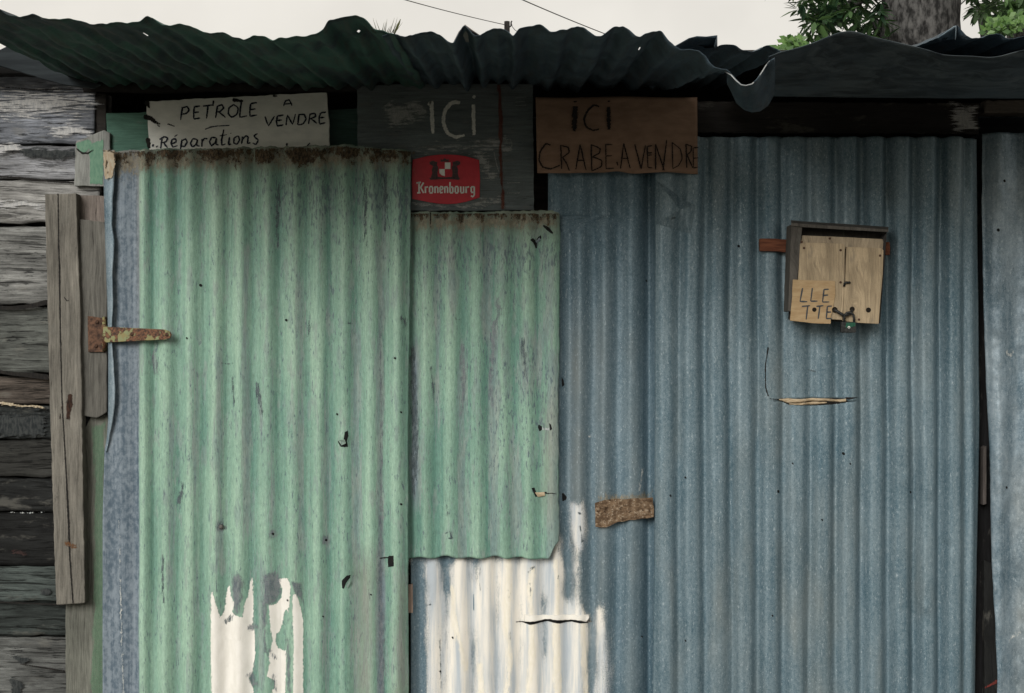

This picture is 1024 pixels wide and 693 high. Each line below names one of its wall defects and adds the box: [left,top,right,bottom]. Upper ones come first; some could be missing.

rust [114,146,416,184]
crack [763,347,771,396]
peeling [210,571,304,693]